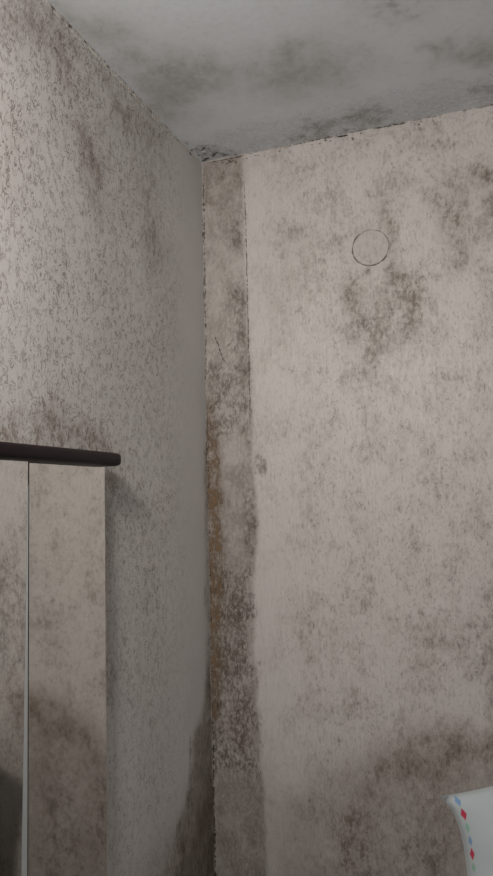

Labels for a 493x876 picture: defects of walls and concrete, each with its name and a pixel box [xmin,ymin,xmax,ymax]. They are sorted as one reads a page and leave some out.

leakage [207,405,254,767]